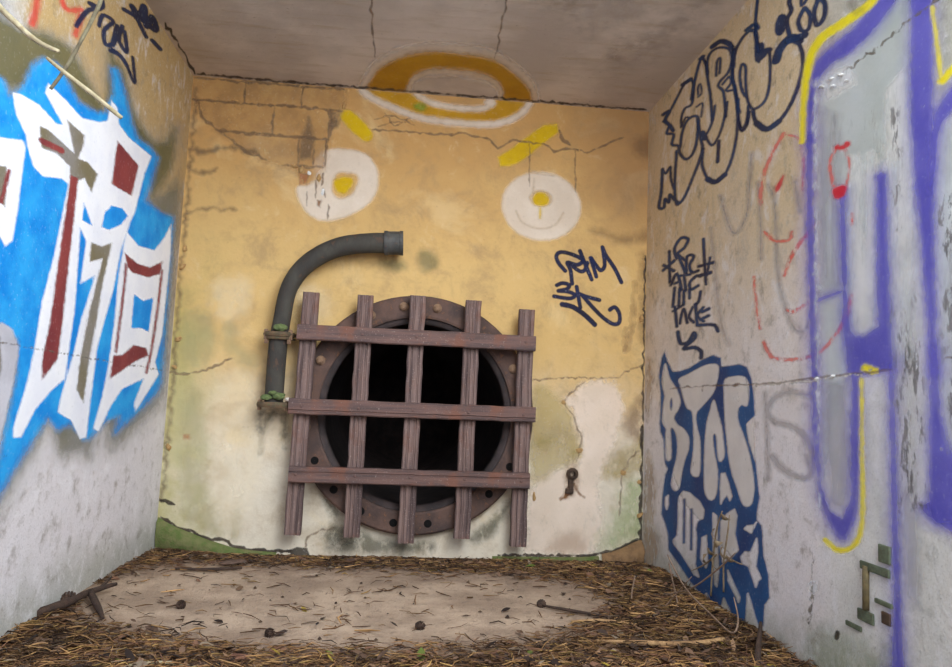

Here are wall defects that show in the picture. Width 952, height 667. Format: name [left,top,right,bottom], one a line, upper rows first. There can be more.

crack [368,0,376,57]
crack [494,0,507,58]
crack [843,0,939,72]
crack [131,22,647,557]
peeling [524,380,624,556]